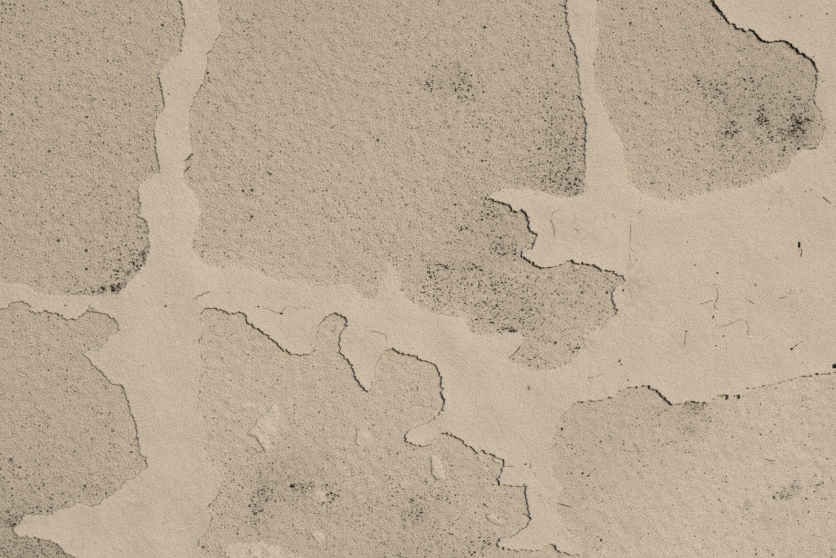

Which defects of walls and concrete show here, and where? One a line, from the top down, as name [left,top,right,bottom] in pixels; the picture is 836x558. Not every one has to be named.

peeling [0,0,185,297]
peeling [183,0,625,371]
peeling [592,0,825,202]
peeling [0,301,148,558]
peeling [195,308,836,558]